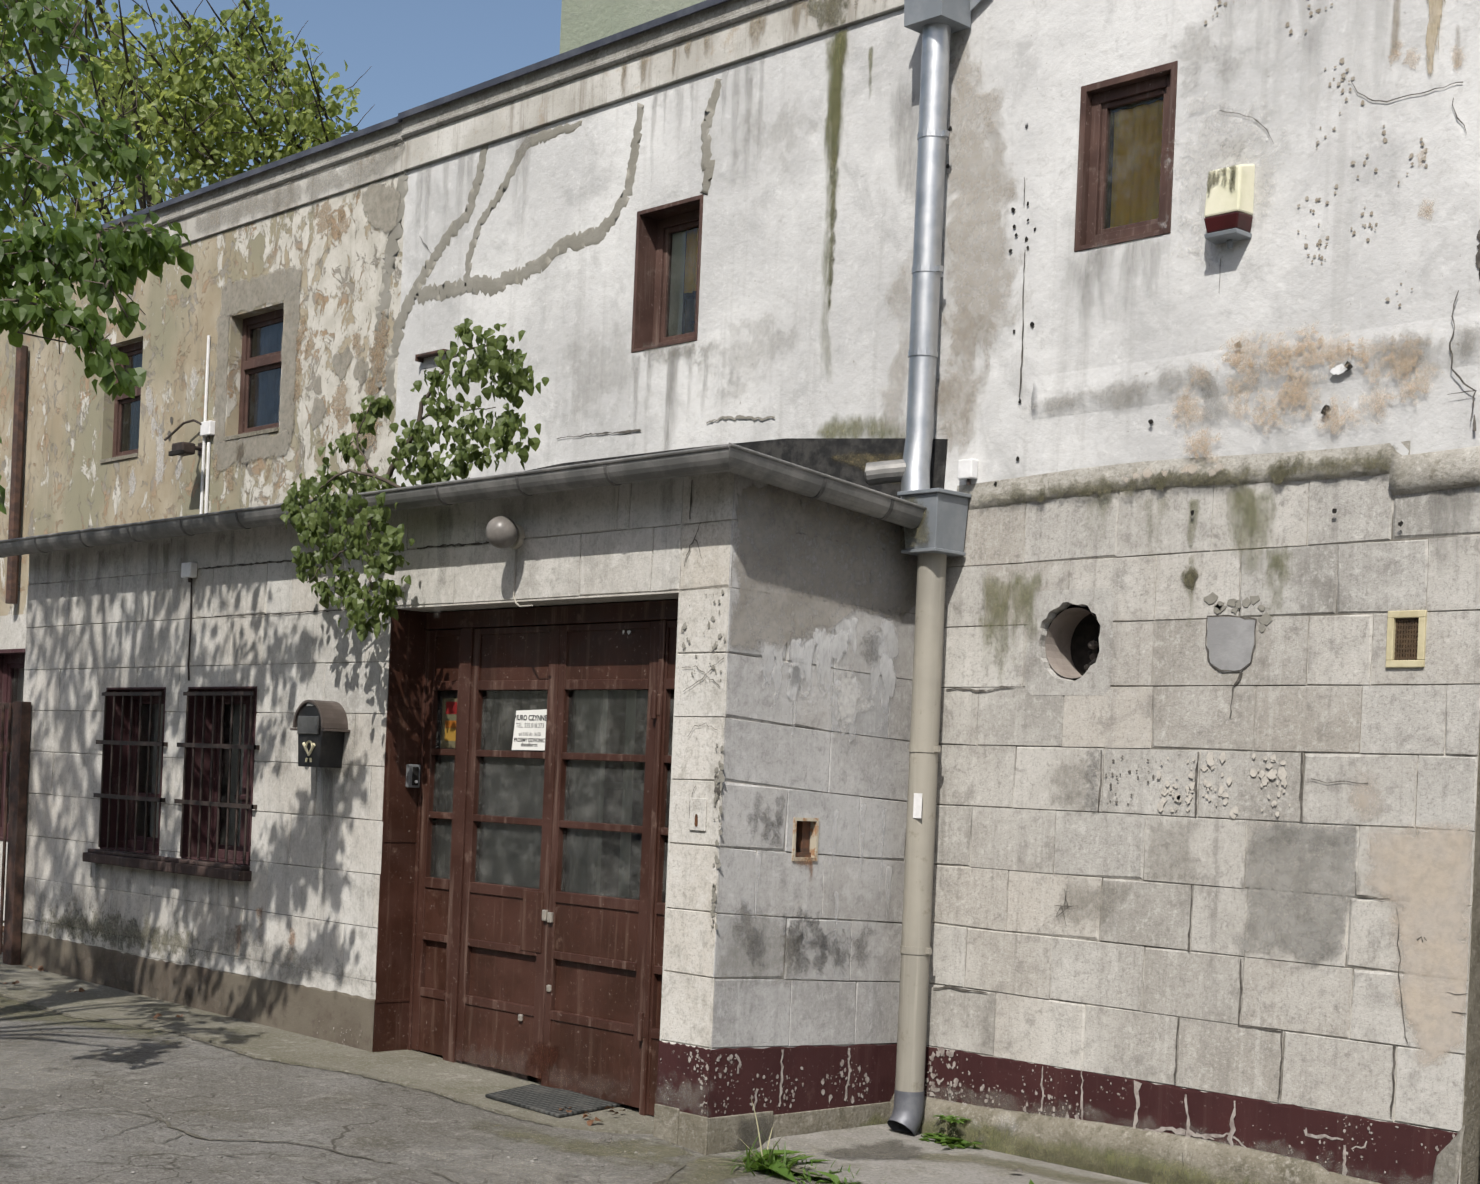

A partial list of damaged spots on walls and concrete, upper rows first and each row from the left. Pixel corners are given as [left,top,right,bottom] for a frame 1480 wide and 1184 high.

crack [1351,81,1467,134]
flaking render [316,198,351,238]
water stain [827,32,847,304]
water stain [943,37,1014,353]
flaking render [294,311,389,451]
flaking render [1330,361,1353,375]
crack [1447,230,1480,431]
peeling [659,1048,871,1113]
peeling [925,1047,1261,1148]
peeling [1280,1116,1376,1176]